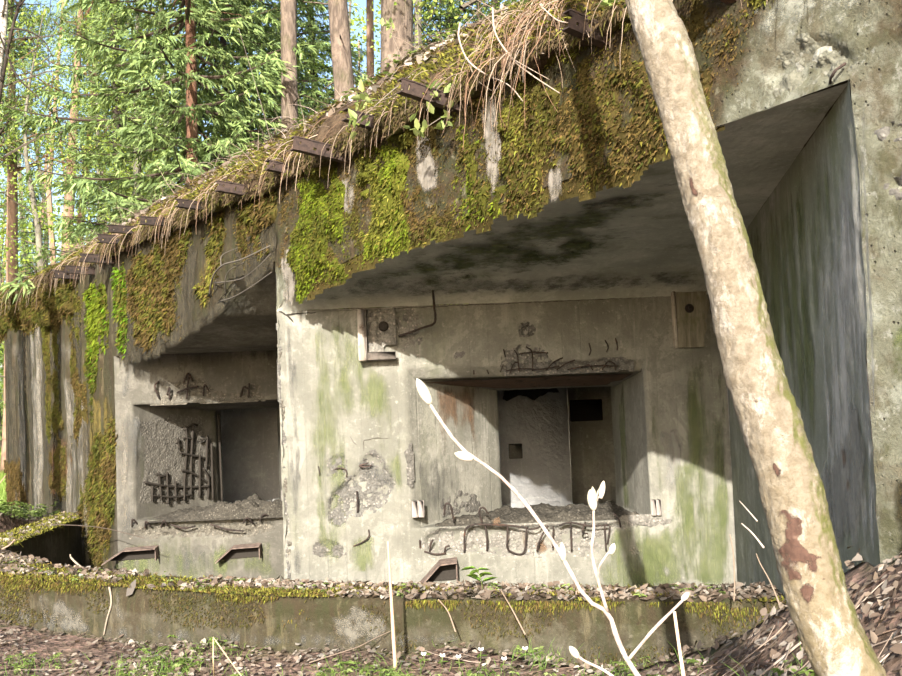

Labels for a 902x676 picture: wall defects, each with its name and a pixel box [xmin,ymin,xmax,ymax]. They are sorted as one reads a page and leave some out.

spalling [500,322,618,374]
water stain [771,283,790,355]
water stain [822,190,874,541]
spalling [139,414,223,506]
spalling [318,449,396,528]
spalling [404,443,415,488]
spalling [312,529,370,559]
spalling [419,539,450,555]
spalling [440,490,672,555]